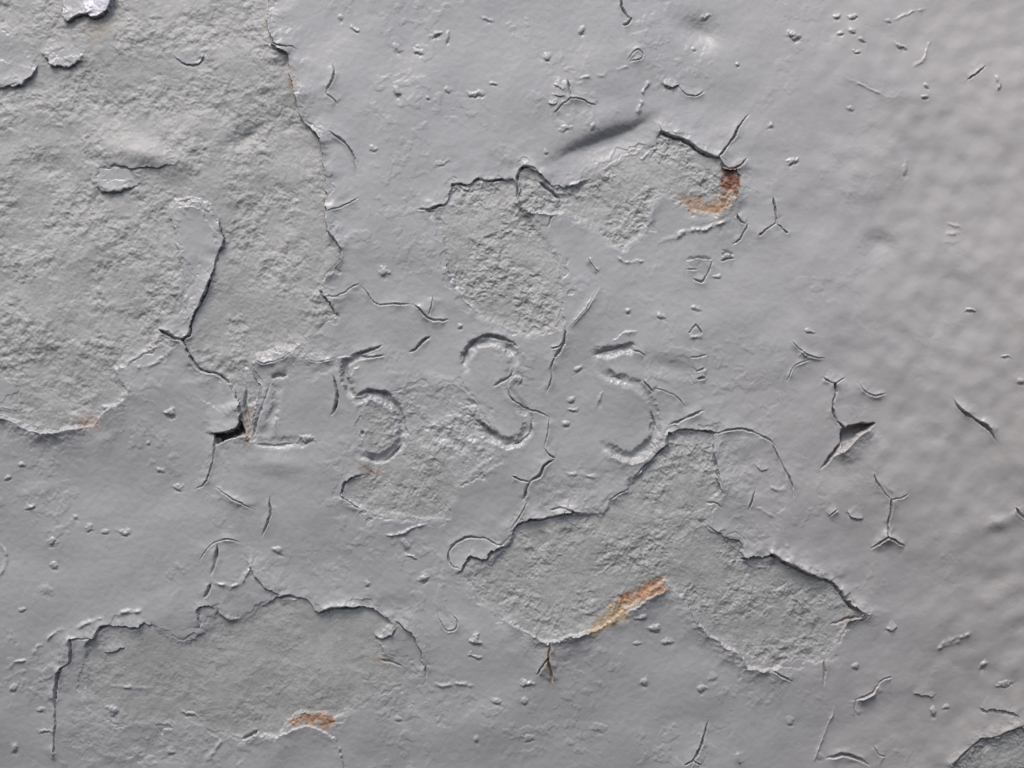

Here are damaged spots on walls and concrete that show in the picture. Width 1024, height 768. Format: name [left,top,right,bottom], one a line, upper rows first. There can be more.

peeling [0,0,363,444]
peeling [414,111,753,336]
rust [675,165,743,217]
crack [728,194,792,249]
crack [490,253,602,533]
crack [784,337,912,553]
crack [950,395,1000,445]
peeling [7,535,487,768]
rust [286,710,340,732]
rust [584,574,671,641]
peeling [444,425,872,688]
peeling [946,702,1024,768]